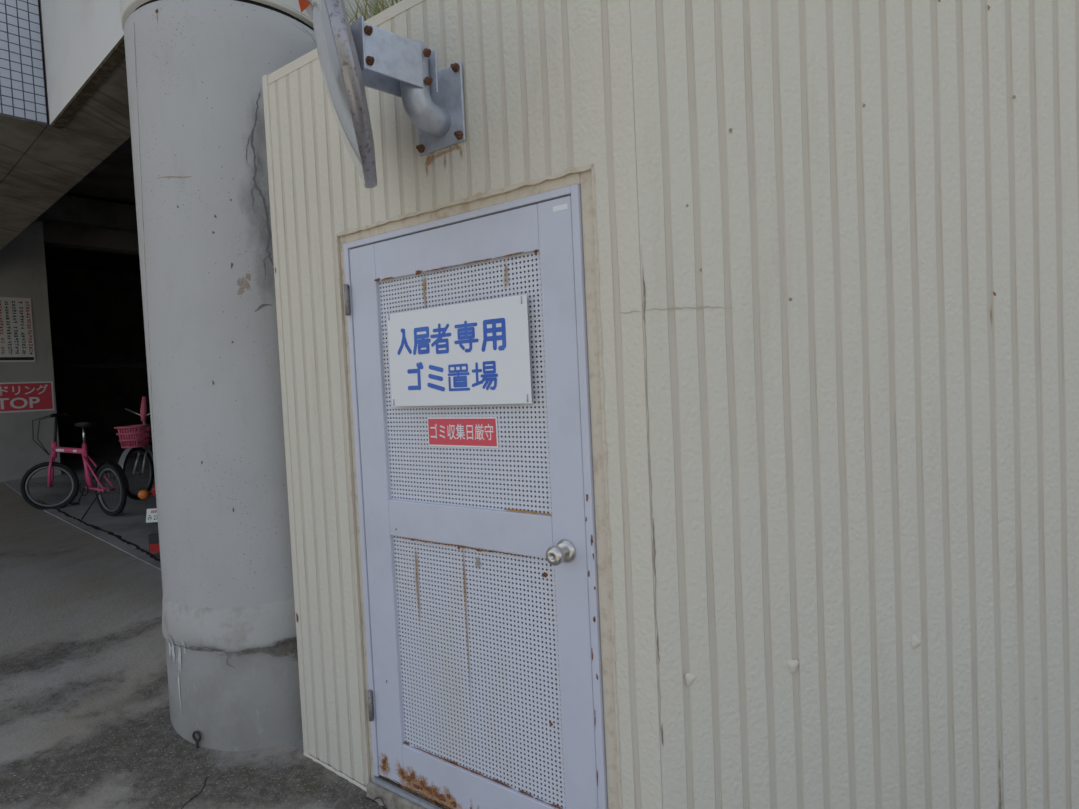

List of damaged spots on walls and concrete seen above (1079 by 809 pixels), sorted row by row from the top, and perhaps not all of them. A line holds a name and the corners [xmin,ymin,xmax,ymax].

crack [246,92,274,277]
rust [416,250,538,303]
water stain [168,636,219,707]
crack [158,630,297,667]
water stain [237,639,298,657]
rust [381,756,471,809]
rust [404,742,561,809]